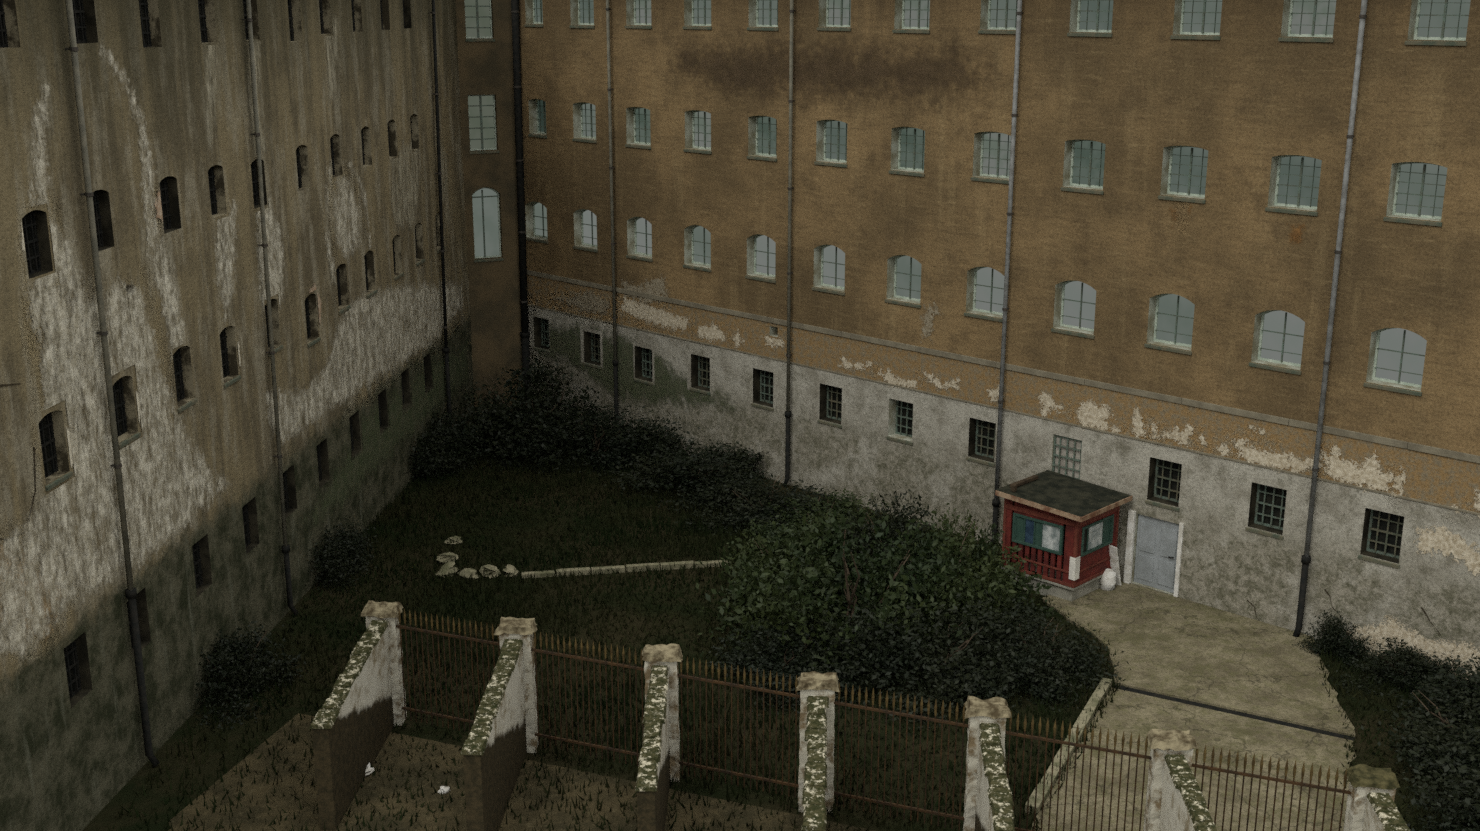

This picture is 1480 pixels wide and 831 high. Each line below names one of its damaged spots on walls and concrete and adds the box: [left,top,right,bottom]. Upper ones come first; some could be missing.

damp [0,45,223,657]
efflorescence [217,201,236,321]
efflorescence [255,199,284,308]
damp [325,162,371,282]
damp [265,282,469,525]
damp [391,143,418,228]
flaking render [554,277,785,350]
flaking render [838,355,962,391]
flaking render [986,387,1006,403]
flaking render [1038,391,1406,497]